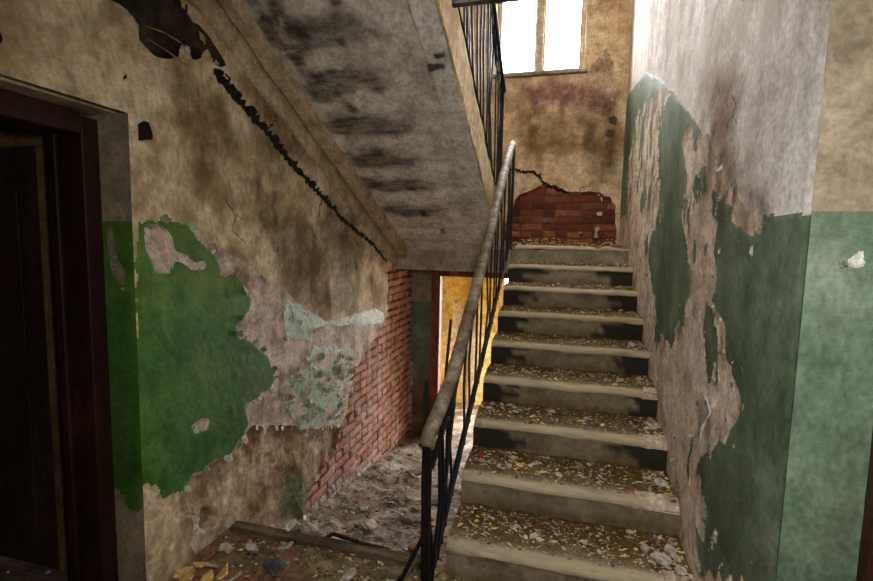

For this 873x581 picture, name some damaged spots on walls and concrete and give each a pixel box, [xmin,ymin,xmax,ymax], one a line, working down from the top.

flaking render [111,0,226,67]
leakage [260,1,360,65]
leakage [309,70,383,99]
leakage [329,106,399,134]
crack [213,68,387,263]
leakage [362,179,425,191]
crack [511,168,590,193]
peeling [504,82,768,581]
flaking render [144,214,413,568]